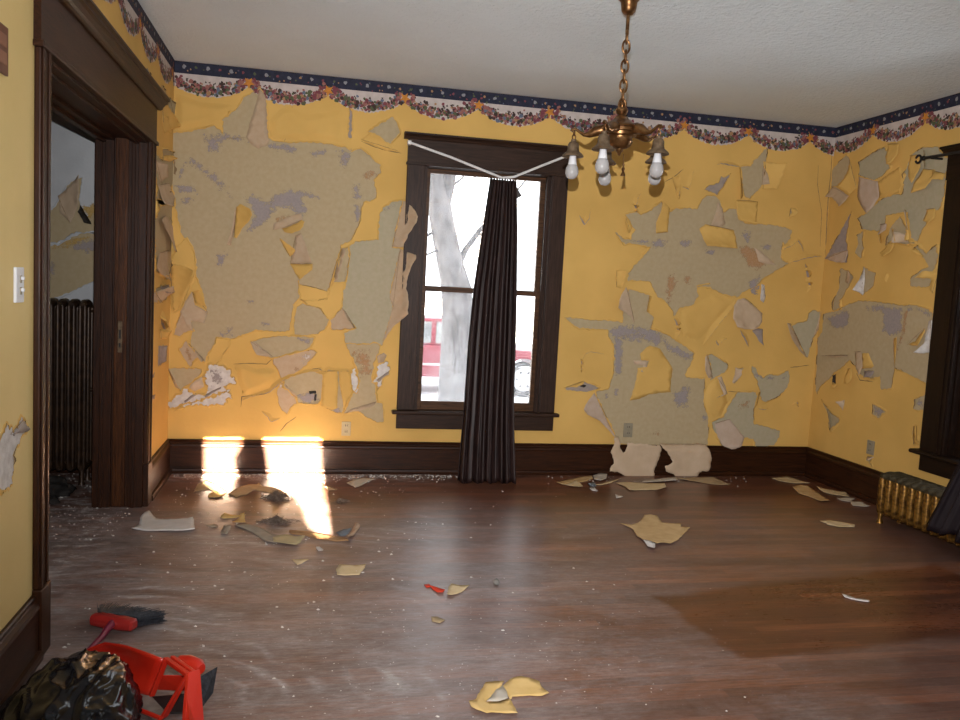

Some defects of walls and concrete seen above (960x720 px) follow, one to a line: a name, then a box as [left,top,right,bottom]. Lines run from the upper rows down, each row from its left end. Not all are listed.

peeling [50,175,95,299]
peeling [153,88,401,424]
peeling [563,147,793,449]
peeling [787,143,948,412]
flaking render [0,414,30,497]